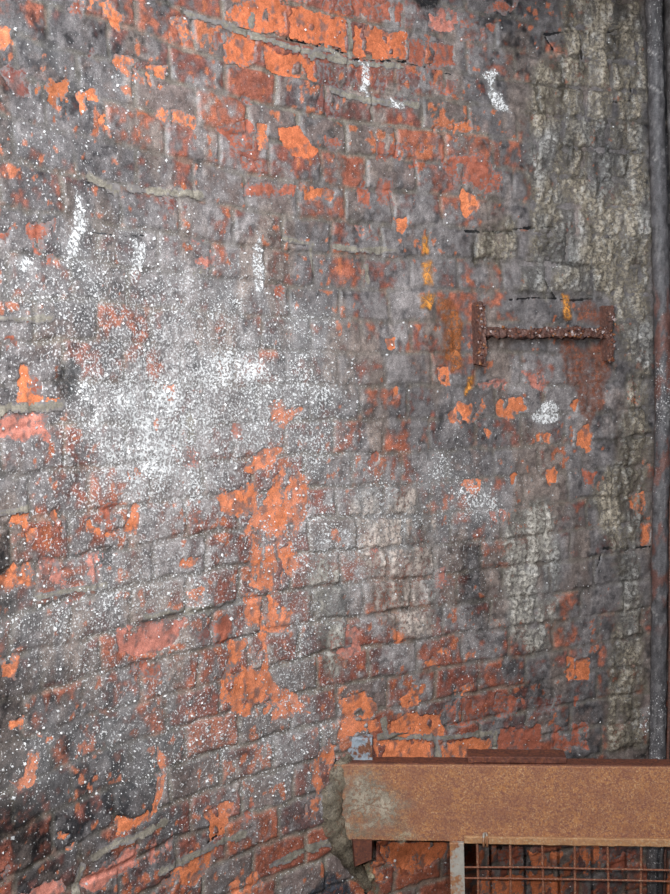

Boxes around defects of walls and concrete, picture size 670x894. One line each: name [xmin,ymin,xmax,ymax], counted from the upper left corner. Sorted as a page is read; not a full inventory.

spalling [213,0,518,119]
leakage [482,69,508,112]
spalling [215,119,344,202]
corrosion [421,236,463,371]
corrosion [562,295,600,321]
corrosion [561,340,609,423]
leakage [519,0,653,751]
spalling [0,550,104,615]
spalling [195,447,311,723]
leakage [0,196,560,852]
spalling [115,617,187,680]
spalling [304,682,589,821]